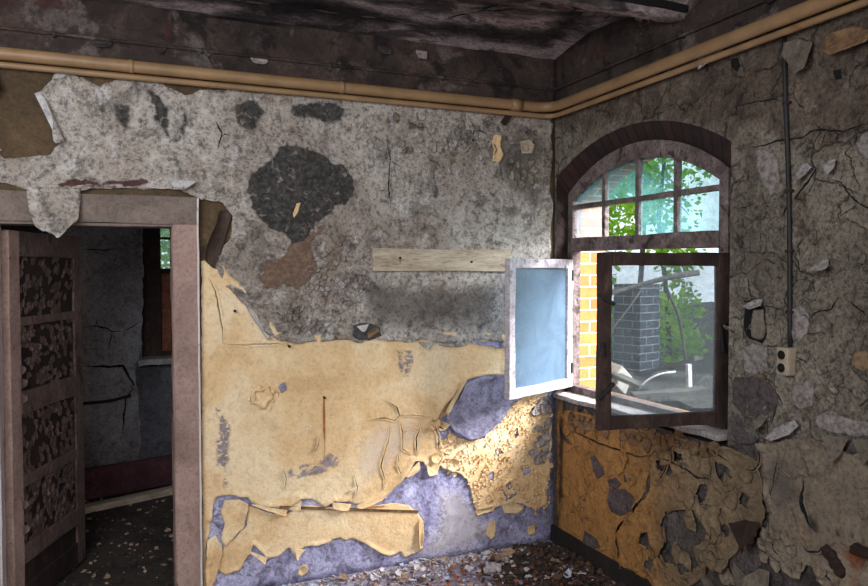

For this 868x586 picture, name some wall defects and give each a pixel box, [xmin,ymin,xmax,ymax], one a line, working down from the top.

crack [731,122,868,242]
peeling [822,159,836,174]
flaking render [856,132,868,159]
water stain [247,144,354,289]
peeling [0,73,553,586]
crack [735,296,777,319]
flaking render [792,305,809,342]
peeling [811,259,829,271]
crack [792,258,868,324]
crack [83,320,140,435]
flaking render [791,379,815,409]
peeling [556,400,868,586]